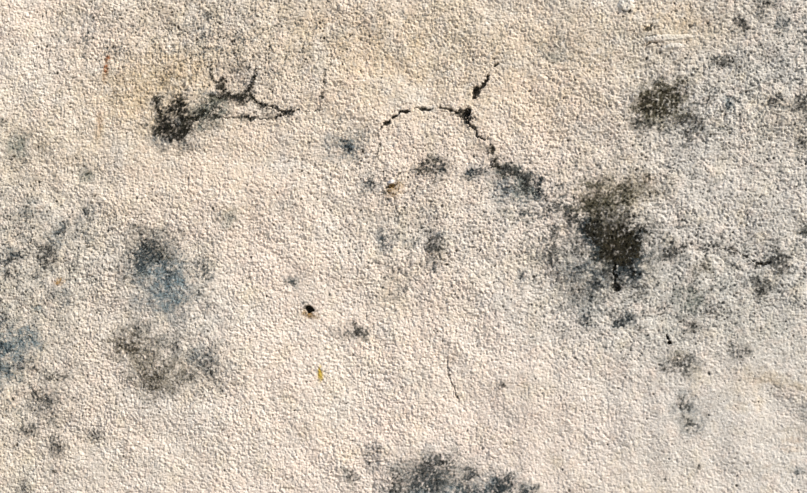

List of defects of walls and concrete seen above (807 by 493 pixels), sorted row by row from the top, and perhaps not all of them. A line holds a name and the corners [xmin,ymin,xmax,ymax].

crack [225,55,332,122]
crack [377,51,517,155]
mould [633,79,703,148]
mould [466,144,654,303]
mould [123,230,200,312]
mould [0,316,36,375]
mould [117,327,214,392]
mould [389,454,539,493]